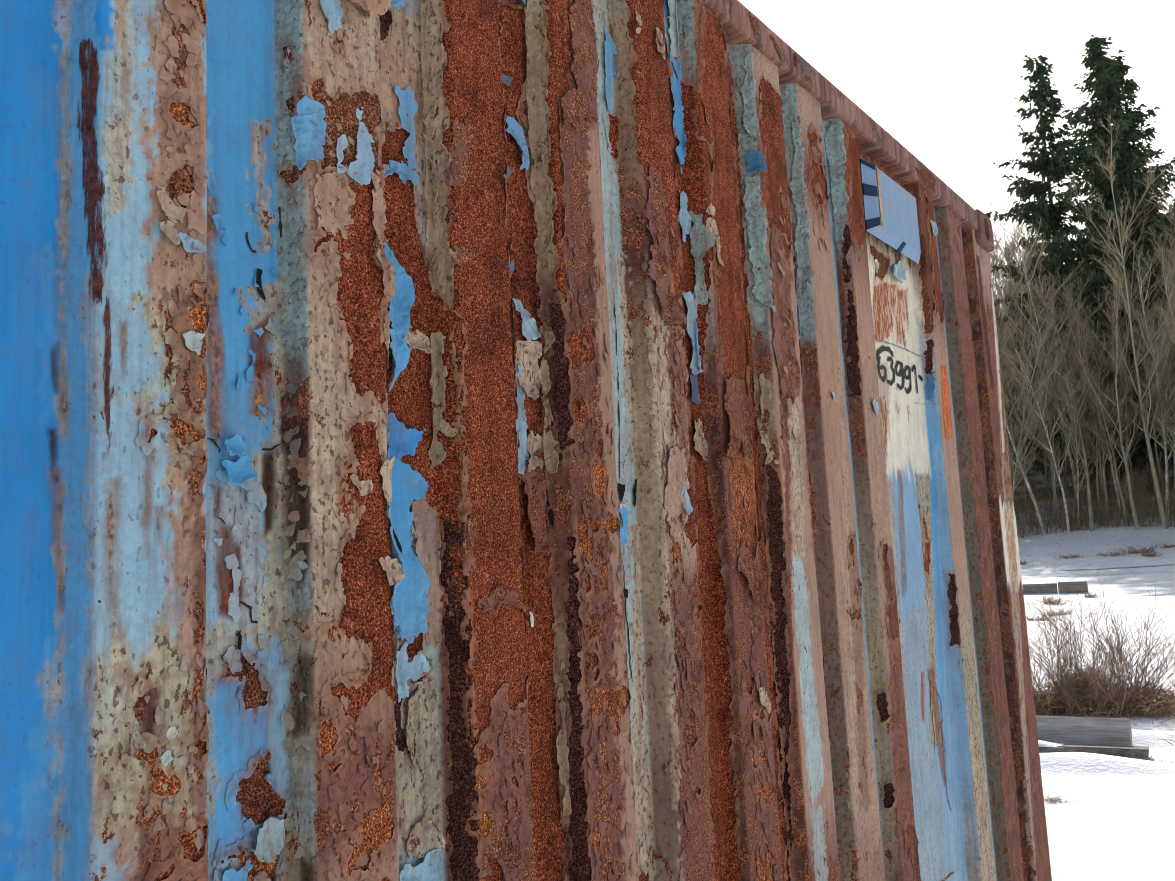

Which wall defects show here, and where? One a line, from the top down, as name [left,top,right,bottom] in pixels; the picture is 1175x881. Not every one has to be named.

corrosion [77,38,125,457]
peeling [155,0,228,457]
corrosion [116,669,294,881]
corrosion [263,419,308,573]
peeling [223,222,352,674]
peeling [328,719,388,838]
peeling [285,85,463,775]
corrosion [275,0,631,881]
corrosion [603,0,798,881]
corrosion [836,131,952,438]
corrosion [918,495,931,575]
corrosion [944,569,961,651]